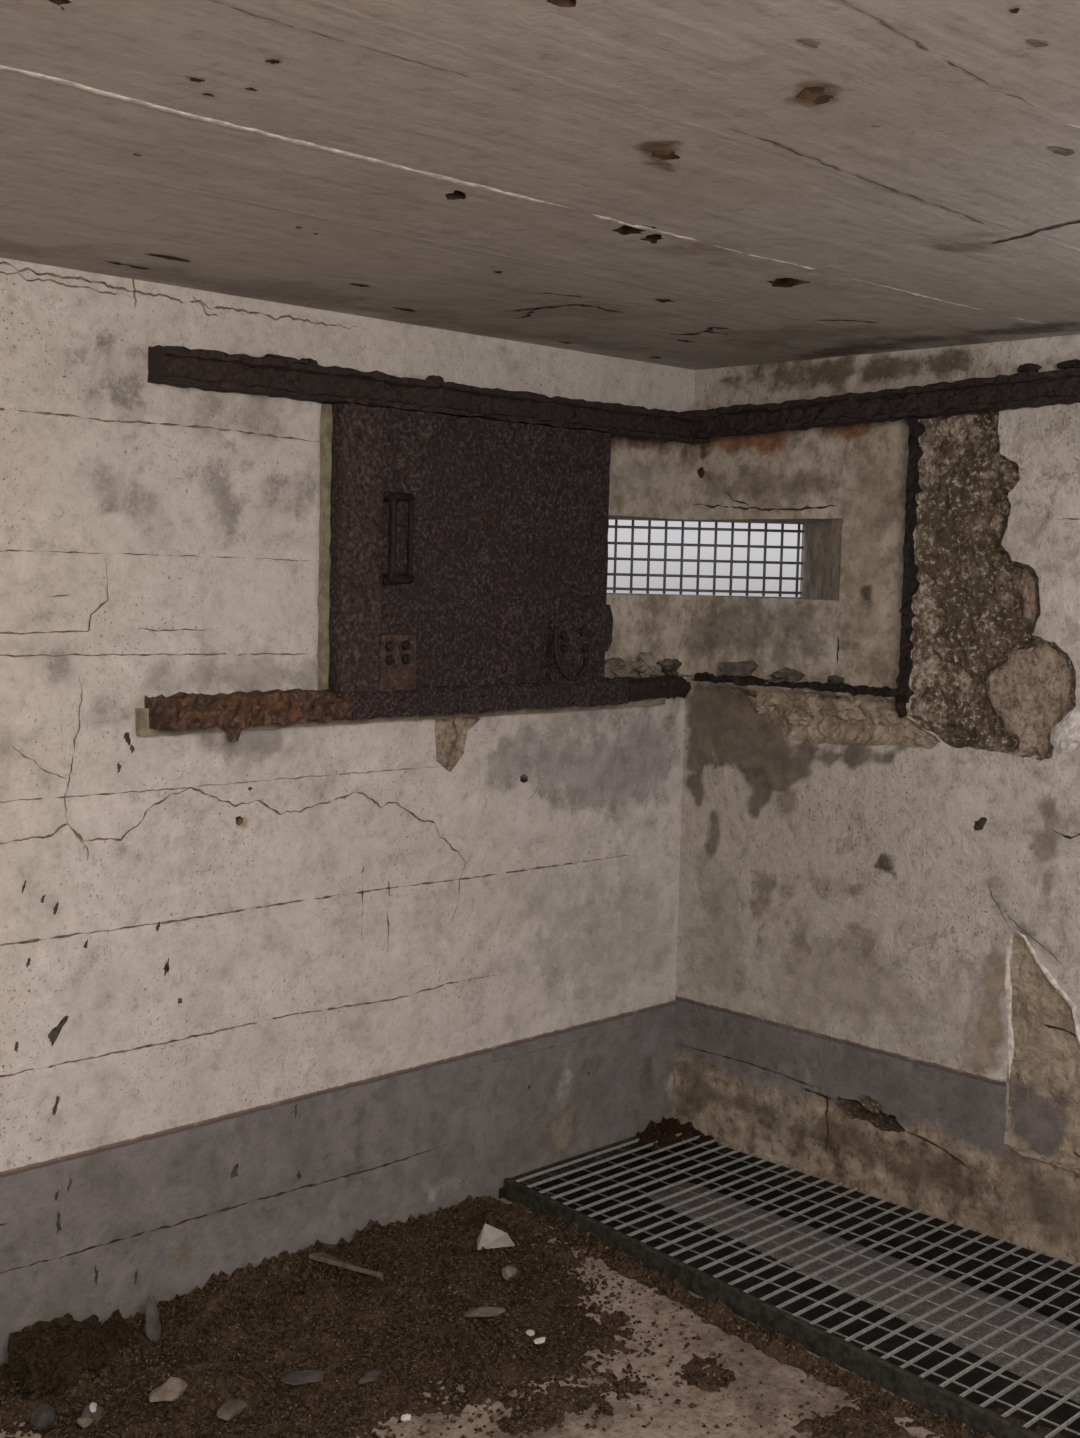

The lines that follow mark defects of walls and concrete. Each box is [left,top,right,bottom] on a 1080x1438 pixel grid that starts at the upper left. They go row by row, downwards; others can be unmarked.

crack [730,129,1080,244]
crack [0,261,356,329]
spalling [691,411,1080,762]
corrosion [221,725,242,742]
crack [0,550,631,946]
spalling [435,716,480,772]
water stain [488,682,903,855]
crack [0,975,495,1078]
peeling [999,929,1080,1175]
crack [0,1145,445,1273]